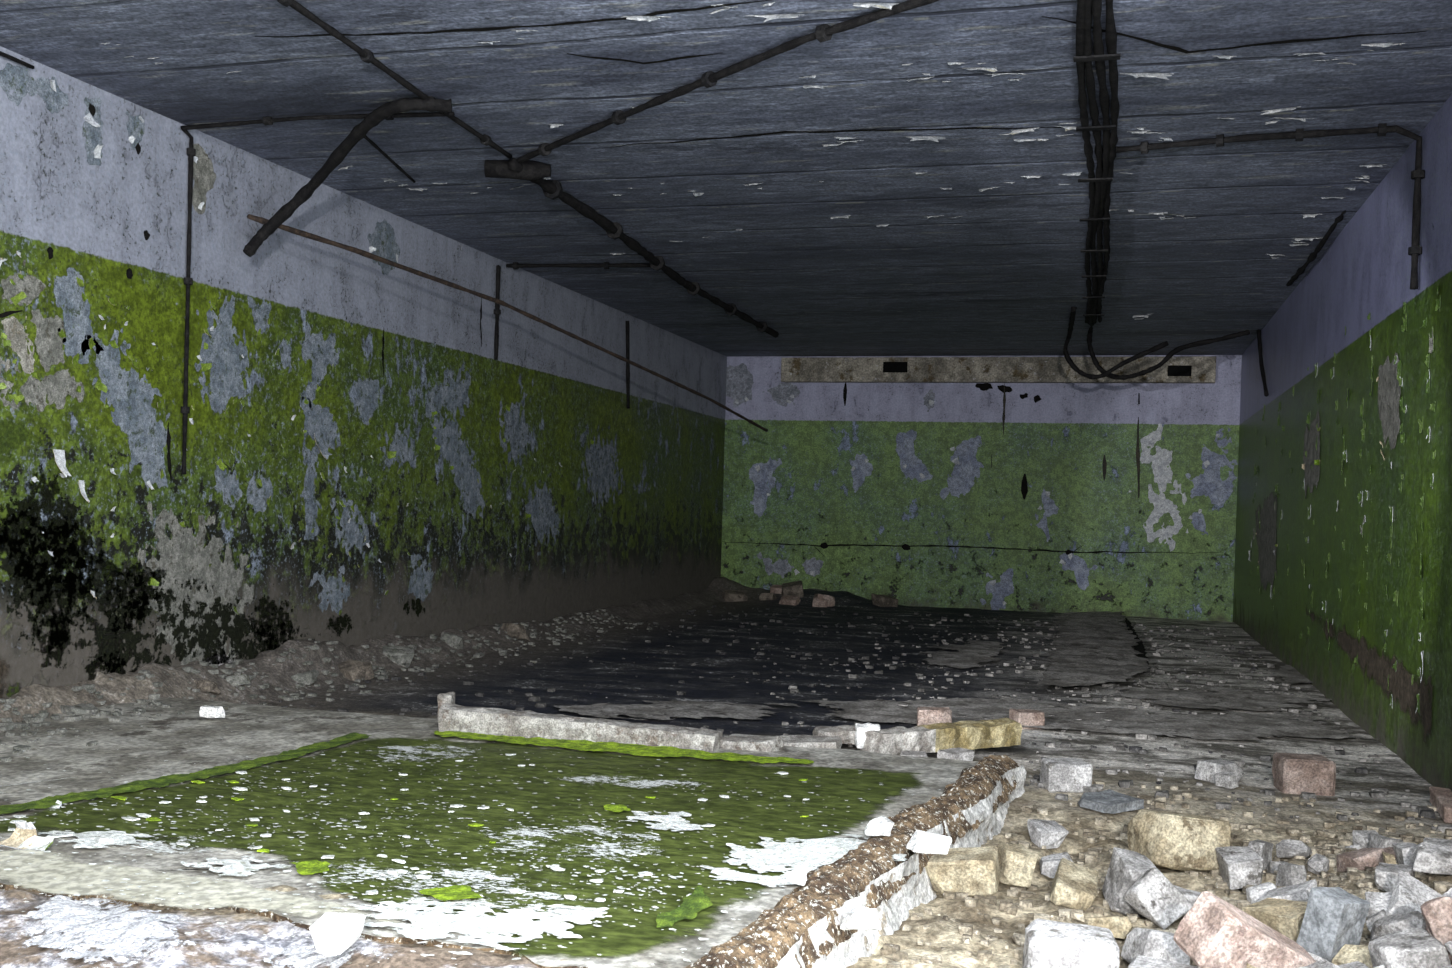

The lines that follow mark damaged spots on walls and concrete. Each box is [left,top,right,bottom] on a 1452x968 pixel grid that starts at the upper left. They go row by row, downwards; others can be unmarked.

peeling [709,2,804,22]
peeling [0,63,104,166]
peeling [999,123,1078,142]
peeling [0,251,273,666]
leakage [0,461,354,698]
peeling [189,295,381,615]
leakage [403,597,425,617]
peeling [413,361,504,524]
peeling [497,392,562,556]
leakage [555,687,1373,741]
peeling [1036,611,1152,687]
peeling [1129,285,1441,714]